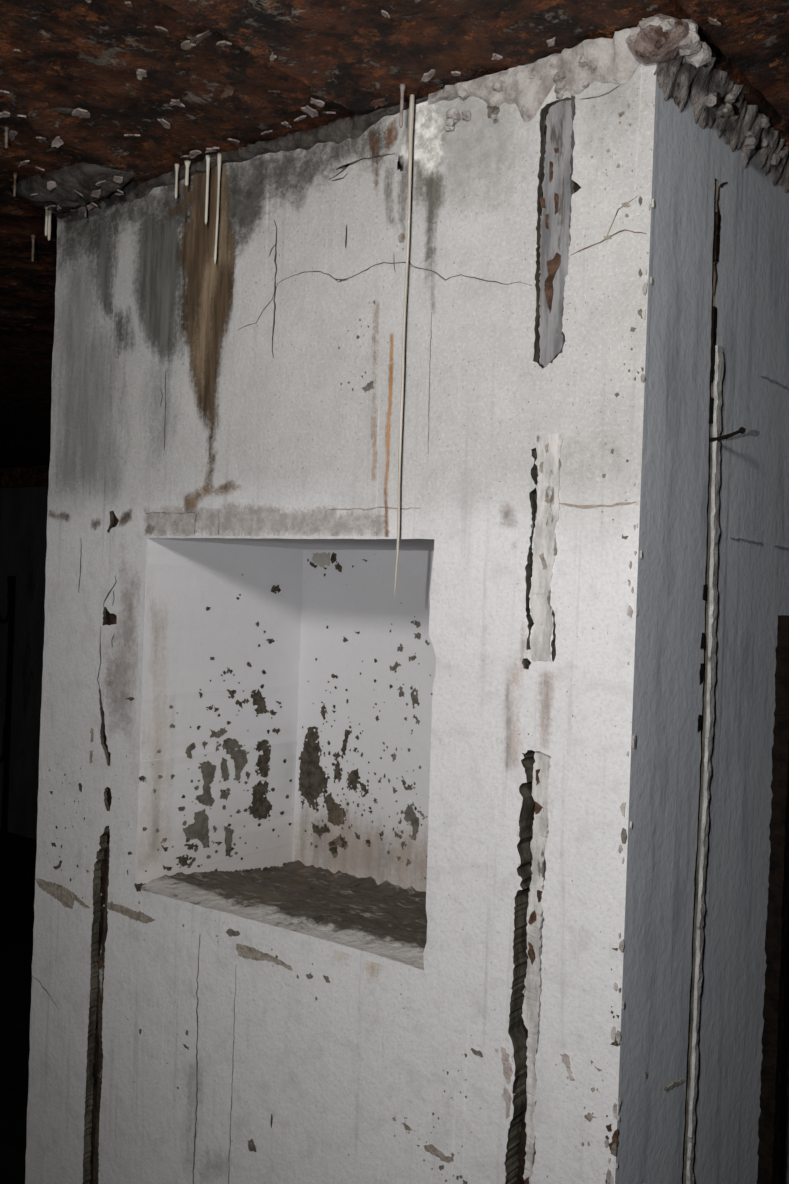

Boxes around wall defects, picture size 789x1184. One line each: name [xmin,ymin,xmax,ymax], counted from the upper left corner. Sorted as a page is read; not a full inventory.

damp [58,123,382,456]
spalling [52,29,642,219]
rust [369,123,397,181]
crack [238,220,532,354]
rust [540,148,559,230]
rust [544,252,561,314]
rust [713,212,721,262]
spalling [654,54,789,193]
rust [372,335,393,536]
spalling [35,706,155,924]
peeling [142,643,433,873]
spalling [584,1099,622,1184]